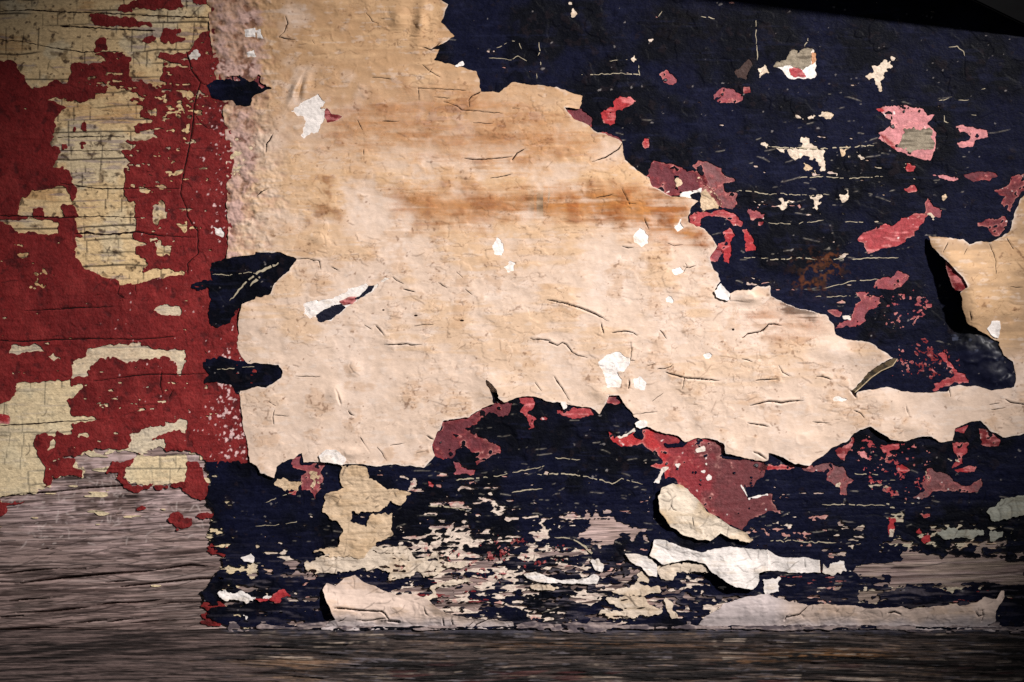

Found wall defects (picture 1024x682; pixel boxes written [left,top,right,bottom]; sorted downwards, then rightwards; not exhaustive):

crack [0,51,210,274]
peeling [0,0,297,328]
peeling [434,0,1024,402]
peeling [0,342,187,516]
peeling [106,352,1024,632]